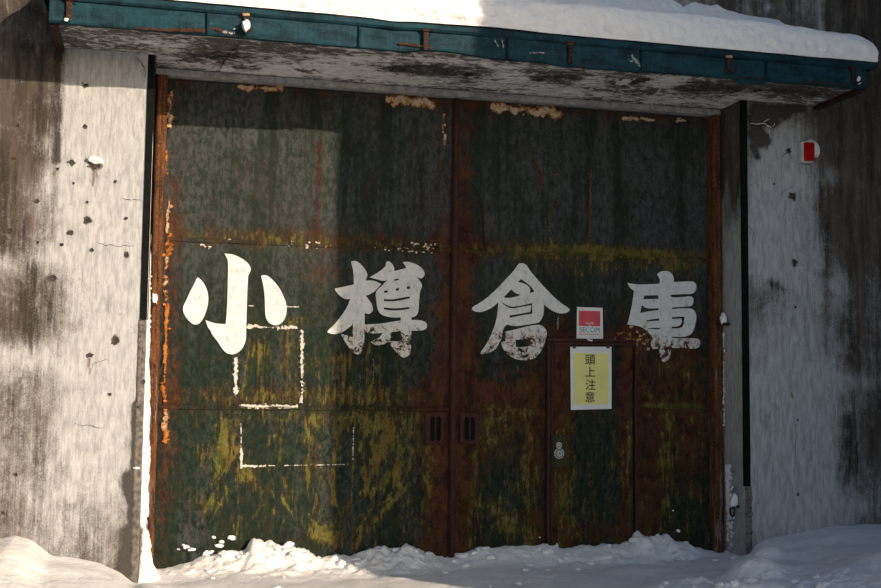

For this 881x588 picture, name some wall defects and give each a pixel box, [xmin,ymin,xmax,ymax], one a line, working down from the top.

damp [21,41,63,163]
peeling [384,94,447,145]
peeling [488,101,563,122]
damp [17,261,55,355]
damp [114,401,144,578]